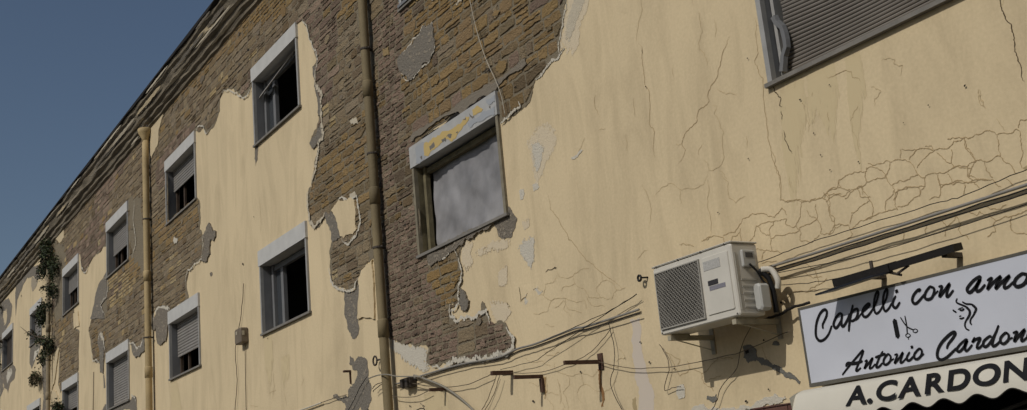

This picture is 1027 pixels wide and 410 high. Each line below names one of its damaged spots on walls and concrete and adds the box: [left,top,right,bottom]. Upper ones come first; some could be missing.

crack [999,0,1023,80]
spalling [0,0,566,397]
spalling [103,396,137,410]
spalling [333,356,372,410]